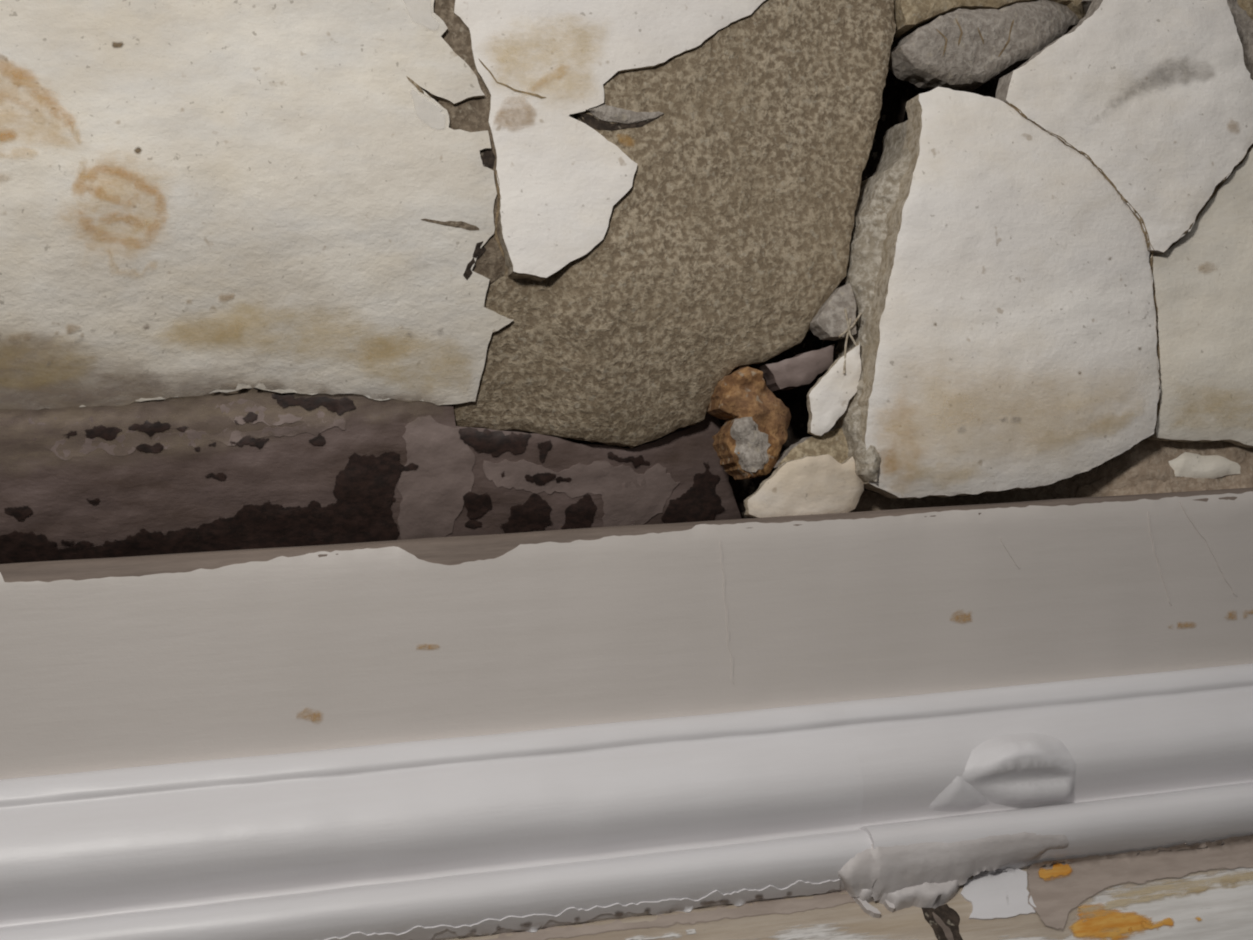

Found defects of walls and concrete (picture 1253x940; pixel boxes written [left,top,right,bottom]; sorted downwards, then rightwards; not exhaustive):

flaking render [1227,0,1253,80]
flaking render [0,0,1086,564]
flaking render [850,438,1253,512]
peeling [325,879,884,940]
peeling [960,835,1253,940]
corrosion [1070,886,1207,940]